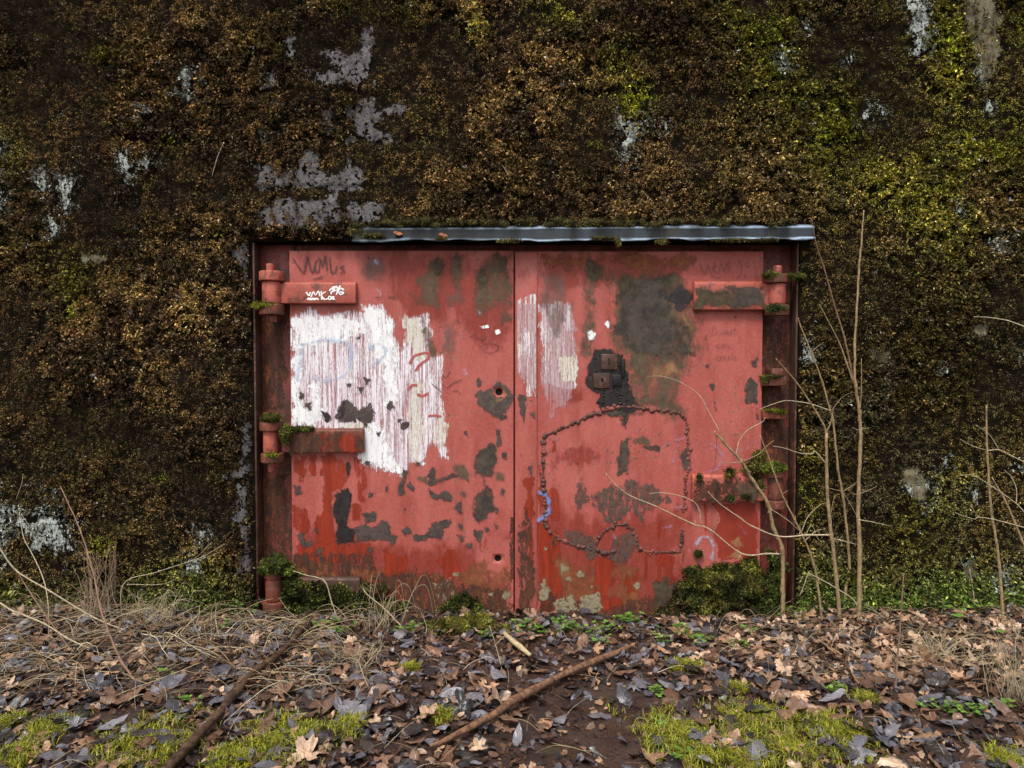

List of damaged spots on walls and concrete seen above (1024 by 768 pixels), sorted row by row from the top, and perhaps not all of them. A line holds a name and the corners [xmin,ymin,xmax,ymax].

peeling [254,26,407,231]
rust [261,319,289,413]
peeling [298,377,410,437]
peeling [333,461,505,558]
rust [263,431,676,615]
peeling [564,478,672,568]